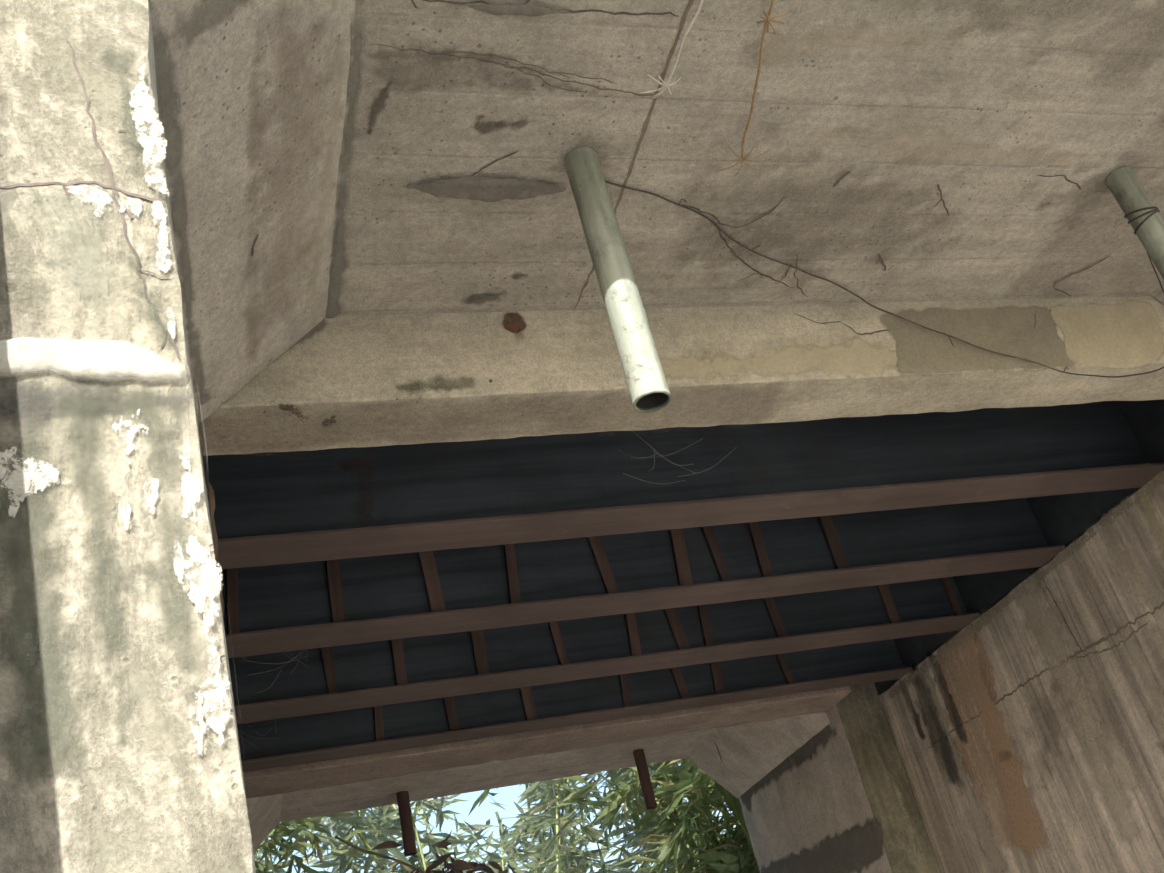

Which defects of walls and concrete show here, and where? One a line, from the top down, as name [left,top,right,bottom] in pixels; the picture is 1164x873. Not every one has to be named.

leakage [125,91,143,145]
crack [371,0,694,215]
crack [0,39,181,360]
rust [503,313,526,333]
crack [574,266,595,310]
crack [683,197,889,335]
crack [934,184,949,216]
leakage [0,387,174,649]
leakage [0,443,77,778]
leakage [147,510,194,669]
crack [1038,567,1086,656]